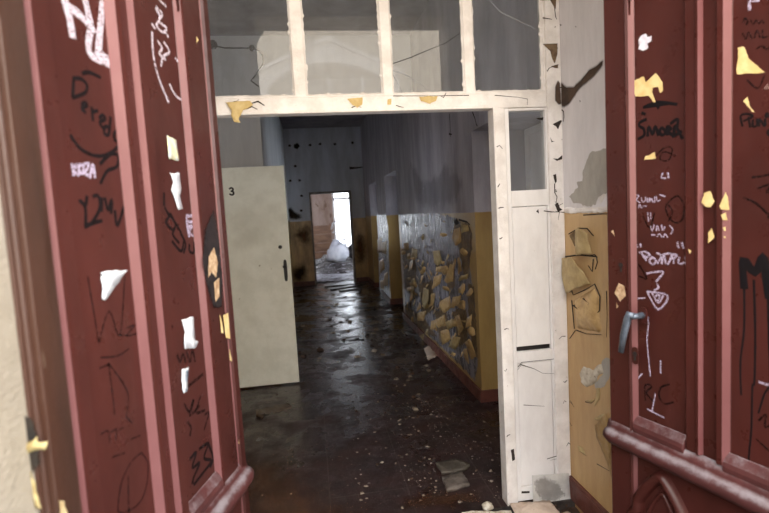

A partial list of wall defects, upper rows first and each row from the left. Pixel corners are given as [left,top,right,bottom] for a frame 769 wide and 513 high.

peeling [544,44,558,68]
peeling [225,101,253,123]
flaking render [555,148,607,216]
peeling [377,214,390,298]
peeling [400,212,478,381]
flaking render [579,358,610,406]